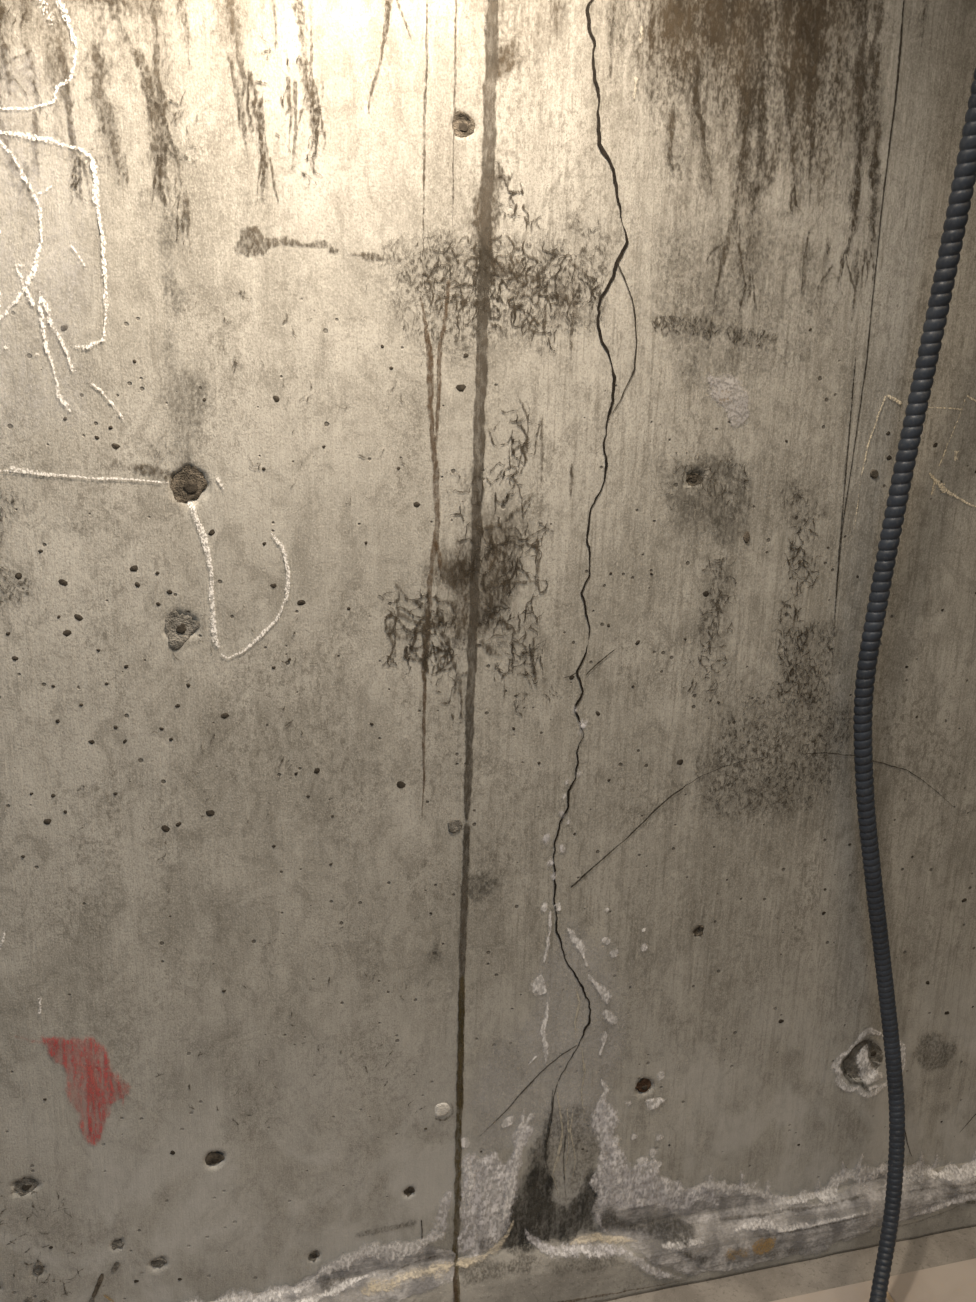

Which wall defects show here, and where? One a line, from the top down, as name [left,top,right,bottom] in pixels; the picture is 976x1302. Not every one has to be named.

damp [0,5,40,97]
damp [0,109,48,192]
damp [50,12,128,199]
damp [135,3,198,245]
damp [226,0,326,201]
damp [368,0,410,109]
damp [384,136,612,351]
damp [649,0,883,309]
mould [379,399,557,719]
crack [480,0,762,1159]
spalling [831,1027,887,1098]